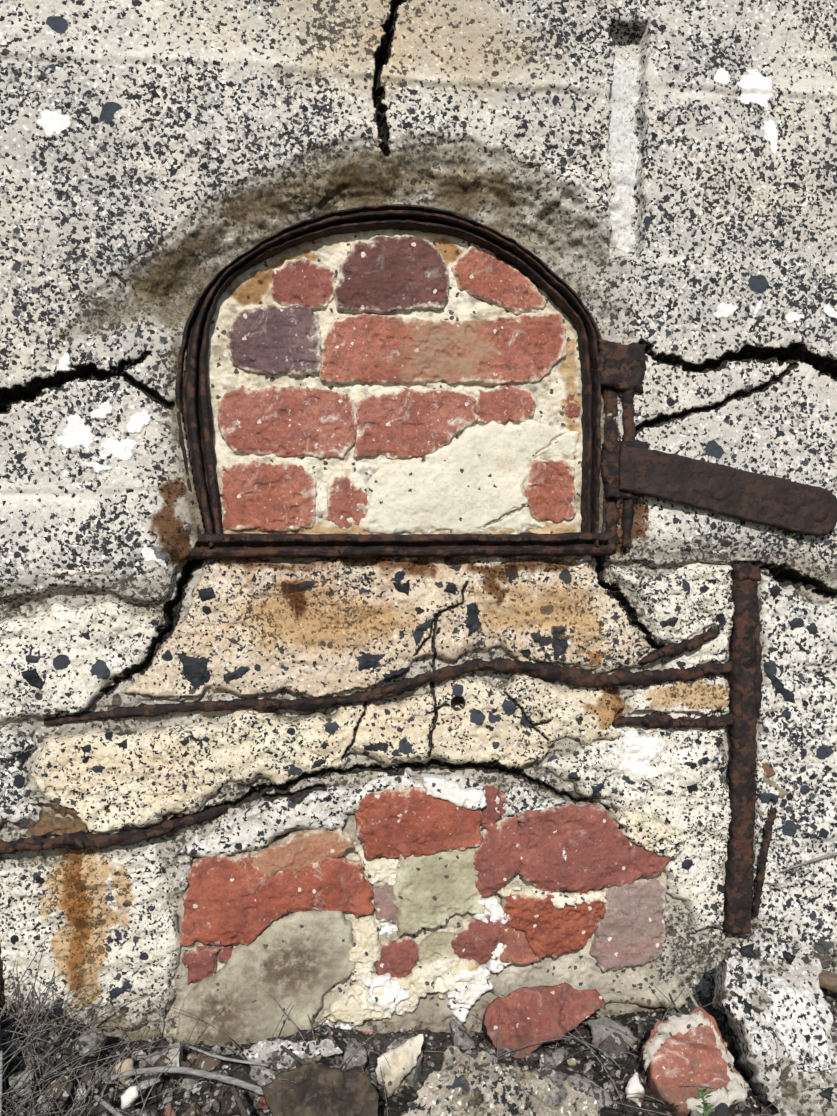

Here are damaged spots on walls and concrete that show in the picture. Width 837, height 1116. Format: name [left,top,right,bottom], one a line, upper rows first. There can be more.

crack [372,0,406,157]
crack [0,351,174,414]
crack [635,340,837,436]
rust [154,481,190,562]
crack [101,560,203,695]
crack [594,556,664,650]
crack [755,561,837,598]
flaking render [0,556,742,1116]
peeling [820,987,837,1013]